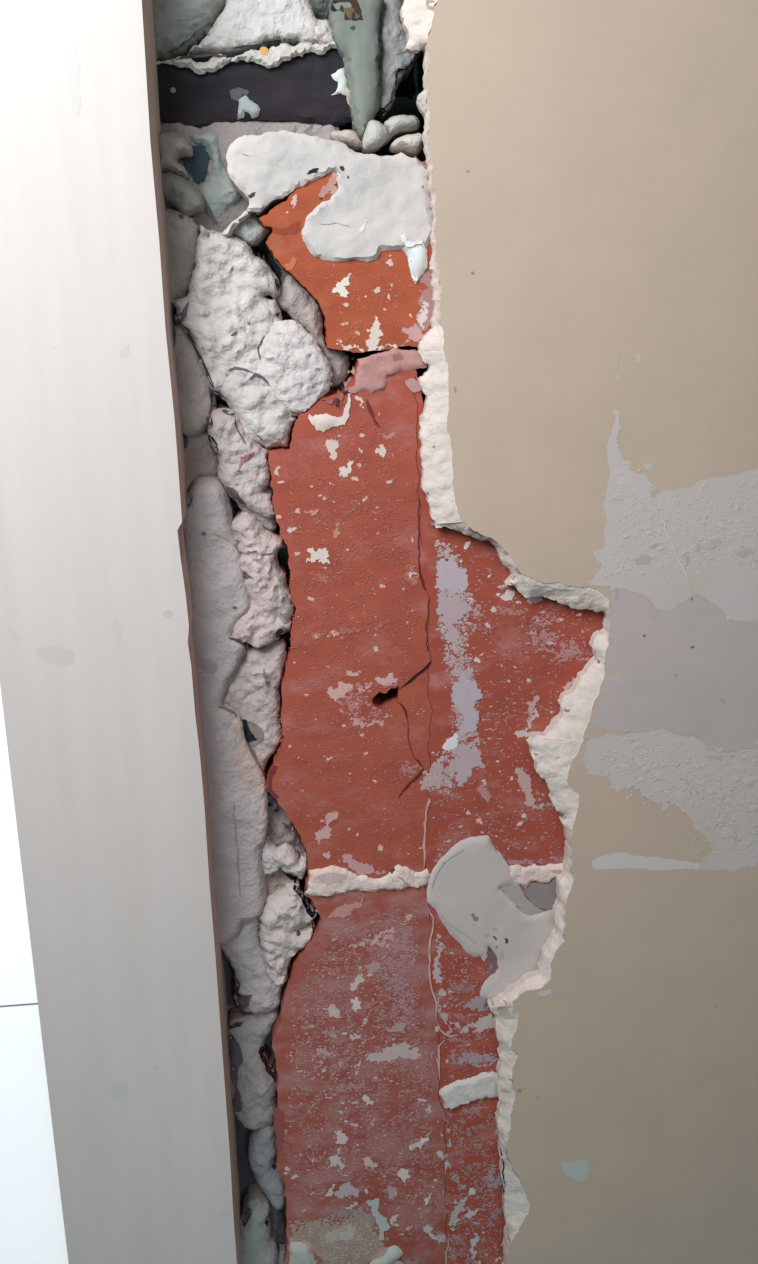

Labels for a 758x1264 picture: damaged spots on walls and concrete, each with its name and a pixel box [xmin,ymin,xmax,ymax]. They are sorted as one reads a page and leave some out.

spalling [237,95,260,120]
spalling [331,68,347,95]
crack [397,497,431,798]
spalling [400,0,609,1264]